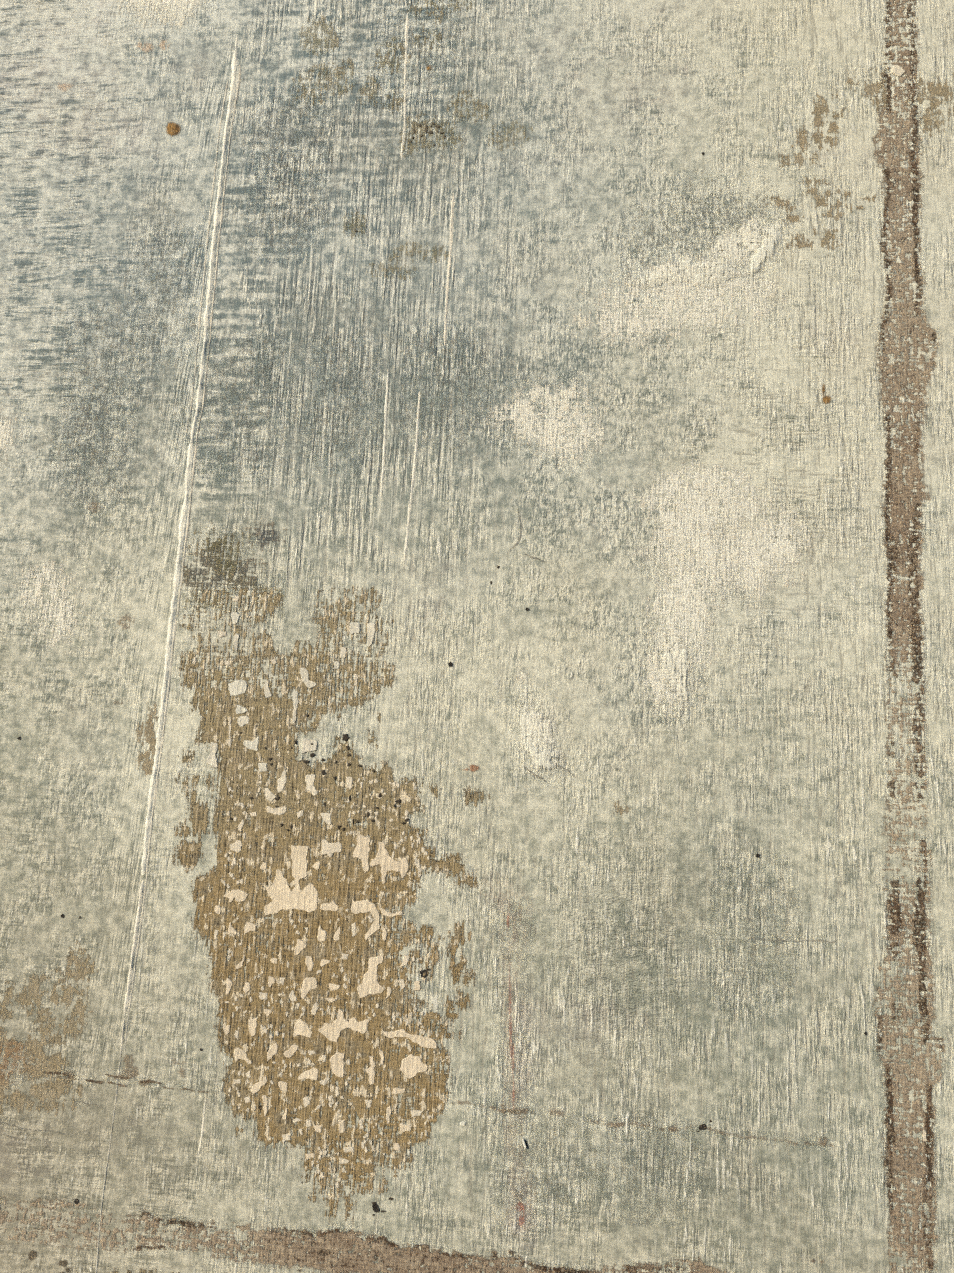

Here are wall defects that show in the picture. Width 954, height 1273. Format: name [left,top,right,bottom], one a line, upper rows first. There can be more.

rust [167,122,180,136]
crack [45,1071,204,1105]
peeling [0,586,730,1273]
peeling [763,0,954,1273]